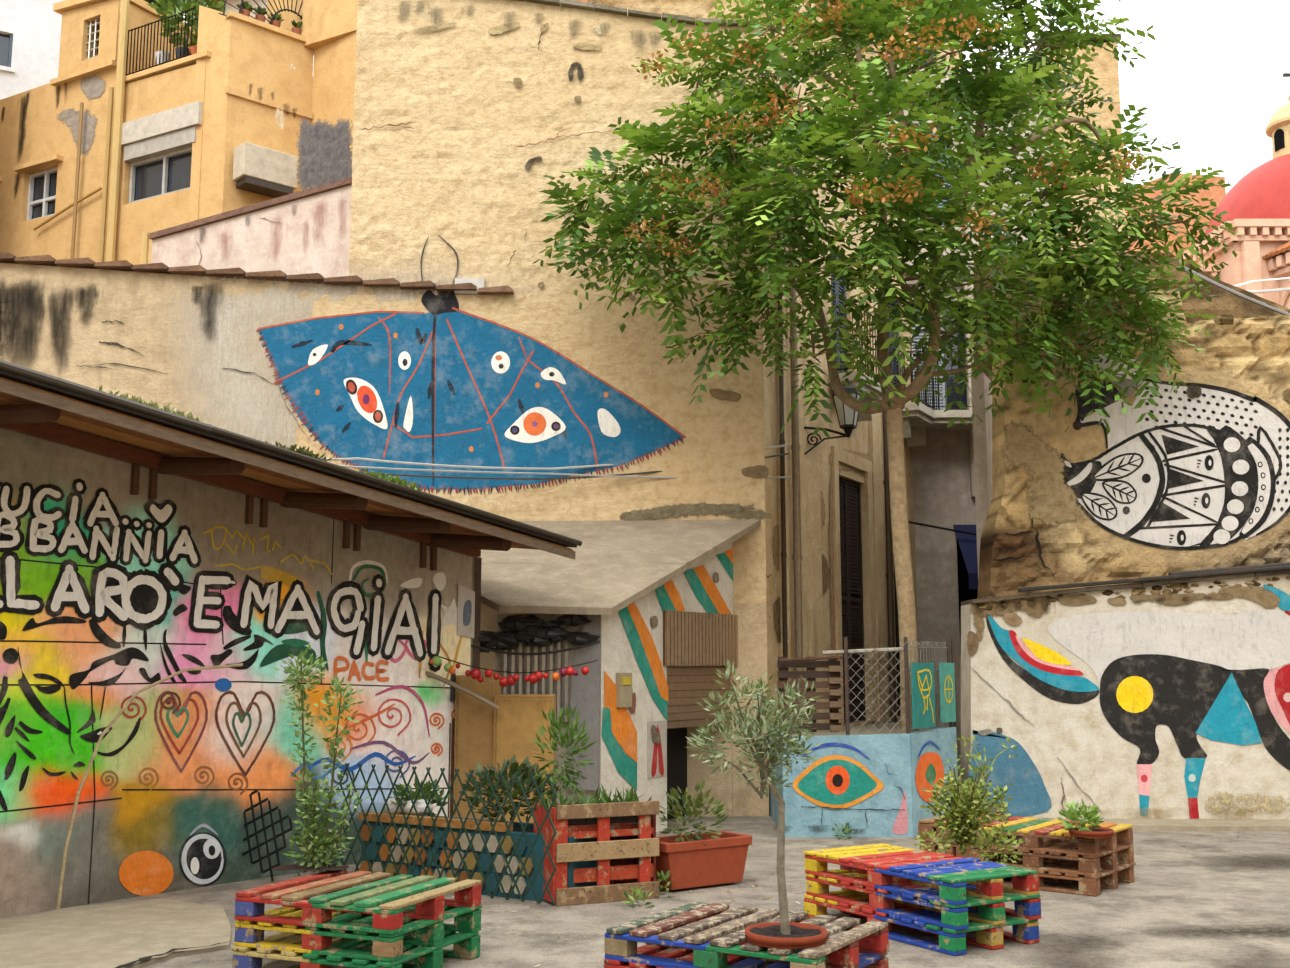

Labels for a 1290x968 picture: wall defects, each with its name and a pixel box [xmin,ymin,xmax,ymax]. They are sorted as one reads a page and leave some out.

water stain [19,93,29,155]
flaking render [57,75,105,154]
flaking render [275,108,353,190]
water stain [0,285,93,363]
water stain [195,286,217,332]
flaking render [967,576,1290,656]
flaking render [1205,792,1290,814]